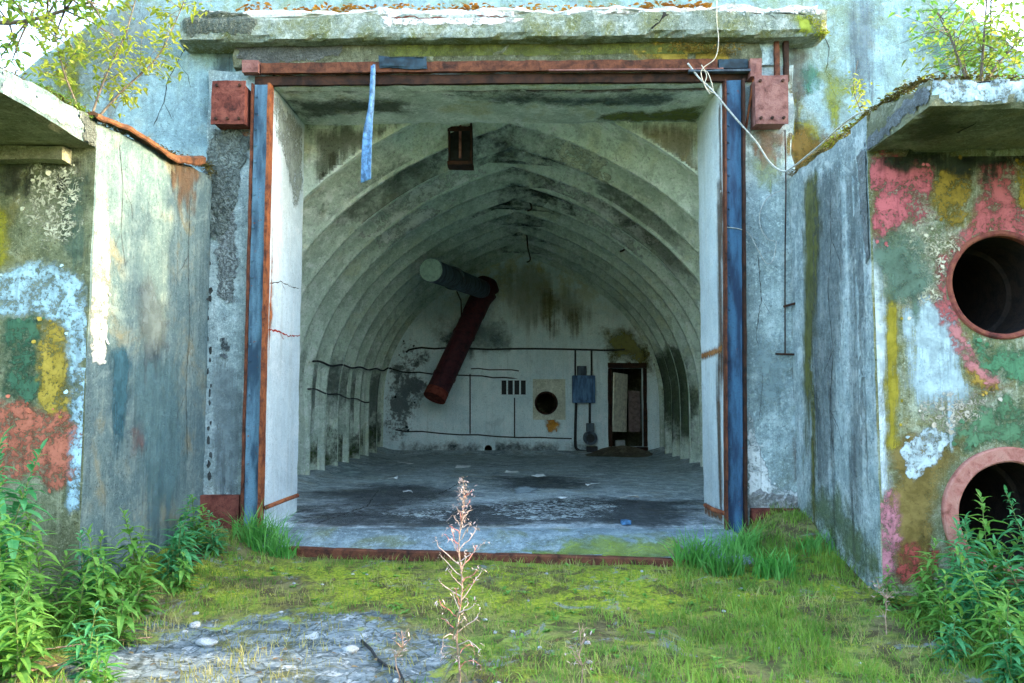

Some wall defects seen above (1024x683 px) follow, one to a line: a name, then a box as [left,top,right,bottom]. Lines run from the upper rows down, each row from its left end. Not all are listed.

peeling [0,163,111,512]
corrosion [171,160,205,213]
water stain [317,127,386,180]
peeling [856,79,1024,479]